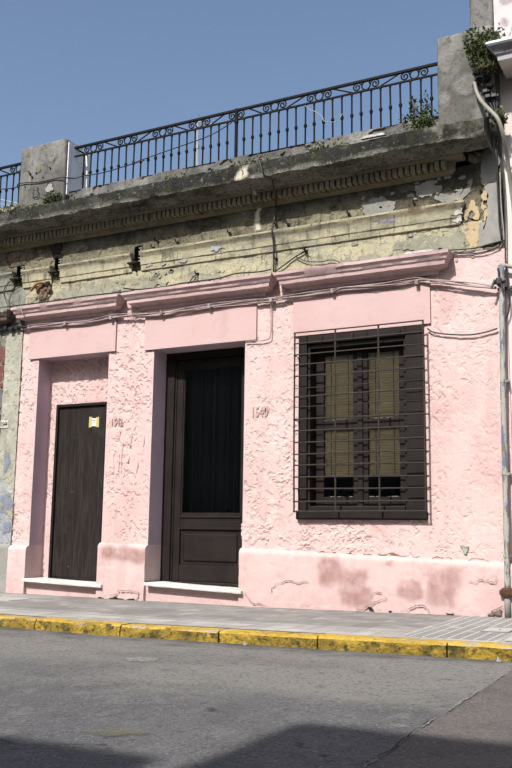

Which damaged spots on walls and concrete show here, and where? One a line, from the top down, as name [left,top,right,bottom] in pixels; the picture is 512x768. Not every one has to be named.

peeling [361,192,396,215]
peeling [407,175,489,258]